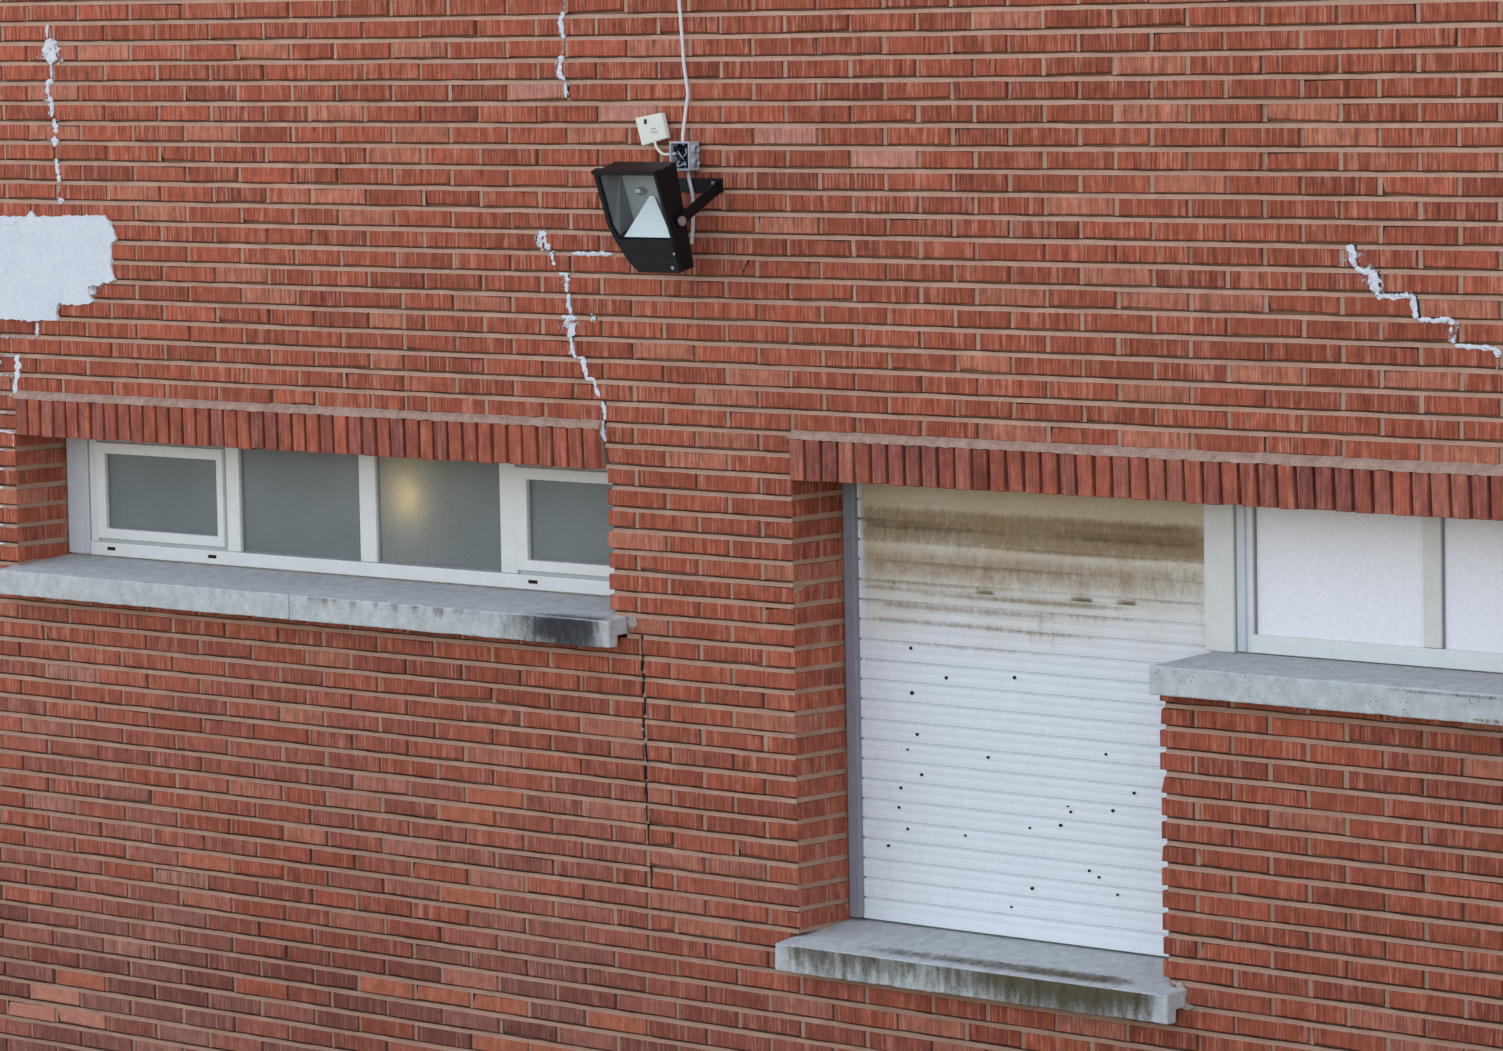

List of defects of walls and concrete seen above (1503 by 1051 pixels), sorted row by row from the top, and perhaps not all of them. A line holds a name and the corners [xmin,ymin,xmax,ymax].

crack [35,24,65,205]
crack [555,0,569,98]
crack [534,229,607,442]
crack [1339,244,1502,369]
crack [0,323,39,564]
leakage [862,484,1203,584]